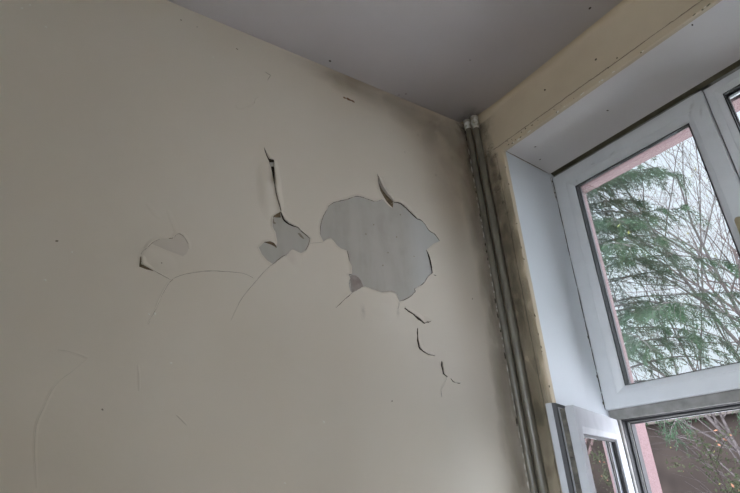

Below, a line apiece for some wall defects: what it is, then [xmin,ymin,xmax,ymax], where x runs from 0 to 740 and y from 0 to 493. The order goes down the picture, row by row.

peeling [257,176,441,321]
crack [398,306,460,397]